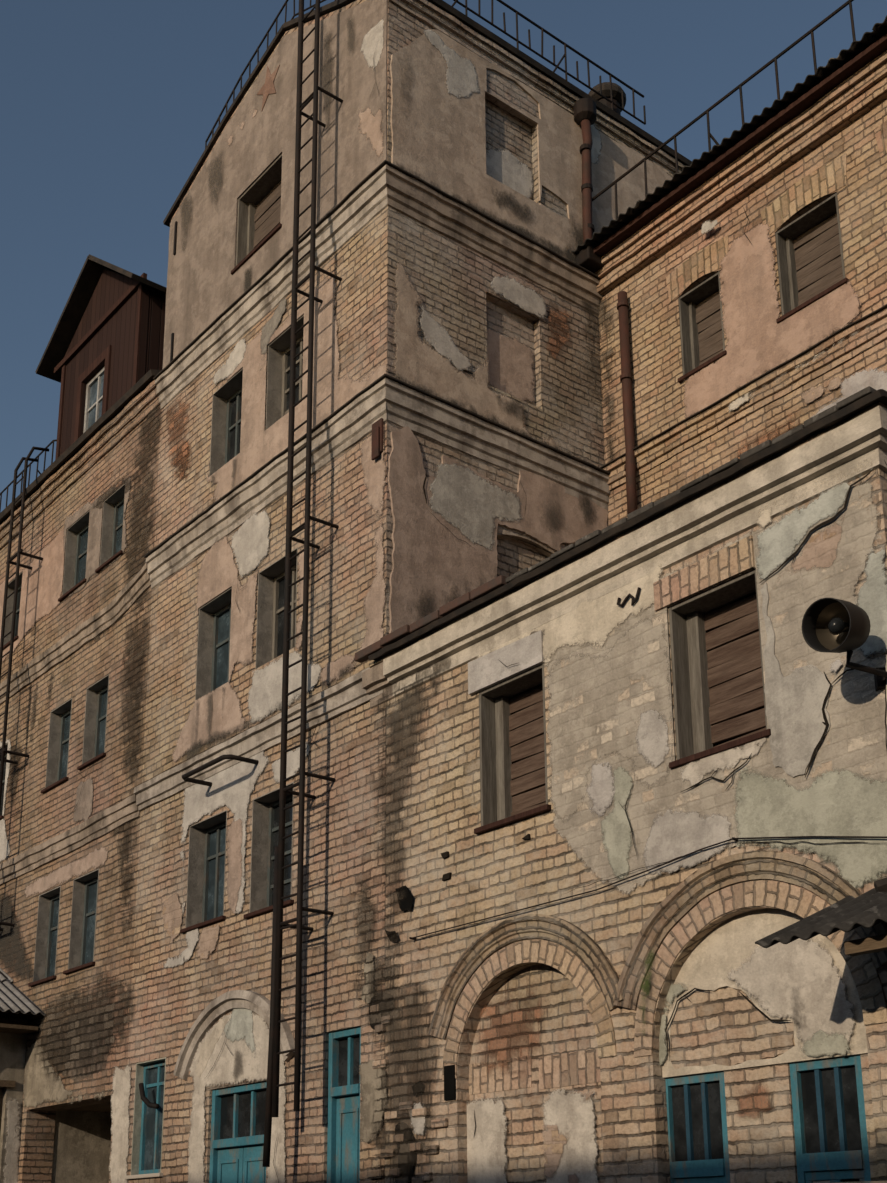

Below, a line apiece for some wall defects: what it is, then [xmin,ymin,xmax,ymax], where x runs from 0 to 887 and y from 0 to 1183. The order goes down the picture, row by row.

flaking render [206,263,566,501]
peeling [802,369,887,417]
peeling [478,459,887,893]
crack [681,753,752,792]
crack [805,669,855,777]
crack [879,678,887,749]
crack [565,786,887,894]
water stain [355,662,863,1183]
water stain [855,921,887,938]
water stain [37,974,134,1078]
spalling [659,983,849,1070]
spalling [444,1065,455,1101]